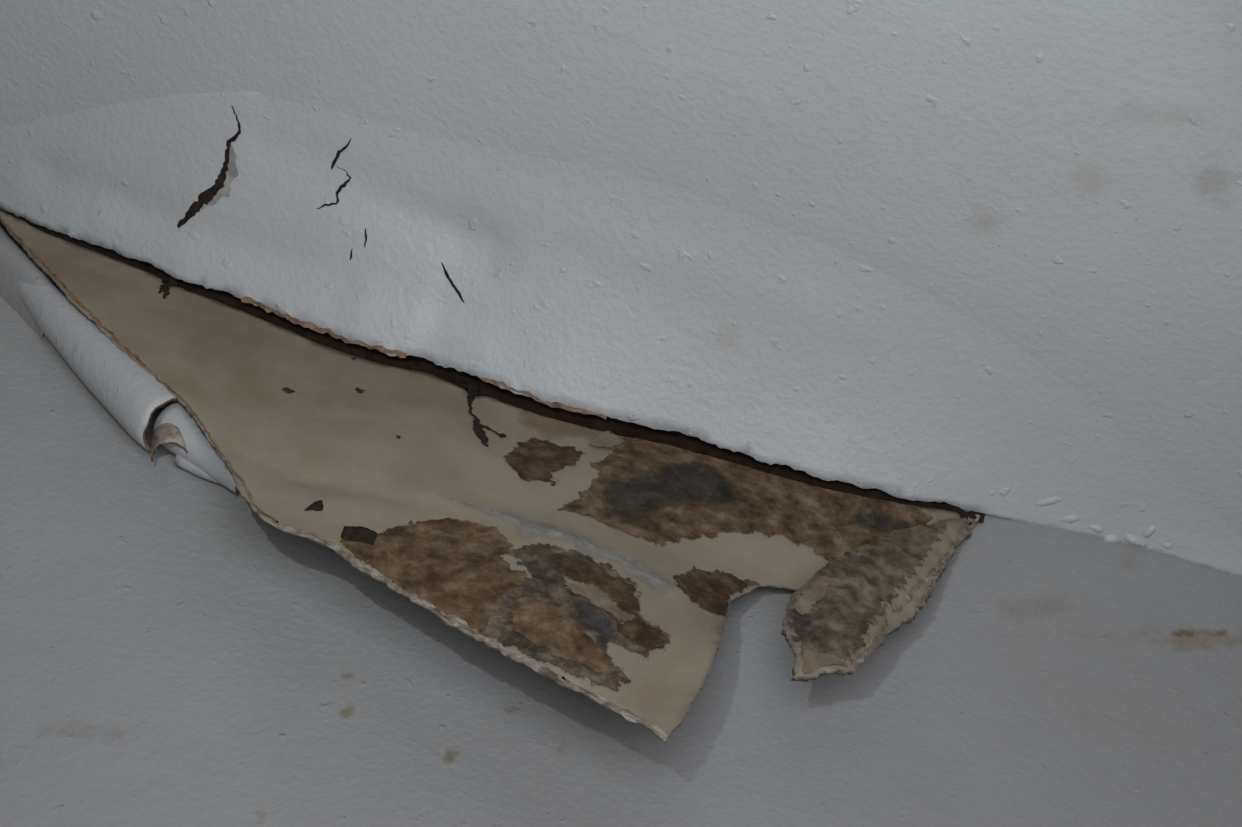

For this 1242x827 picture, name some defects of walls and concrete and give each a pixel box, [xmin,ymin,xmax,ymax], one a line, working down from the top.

crack [177,106,241,229]
crack [317,138,351,209]
peeling [0,210,980,742]
water stain [340,517,670,692]
water stain [503,412,947,674]